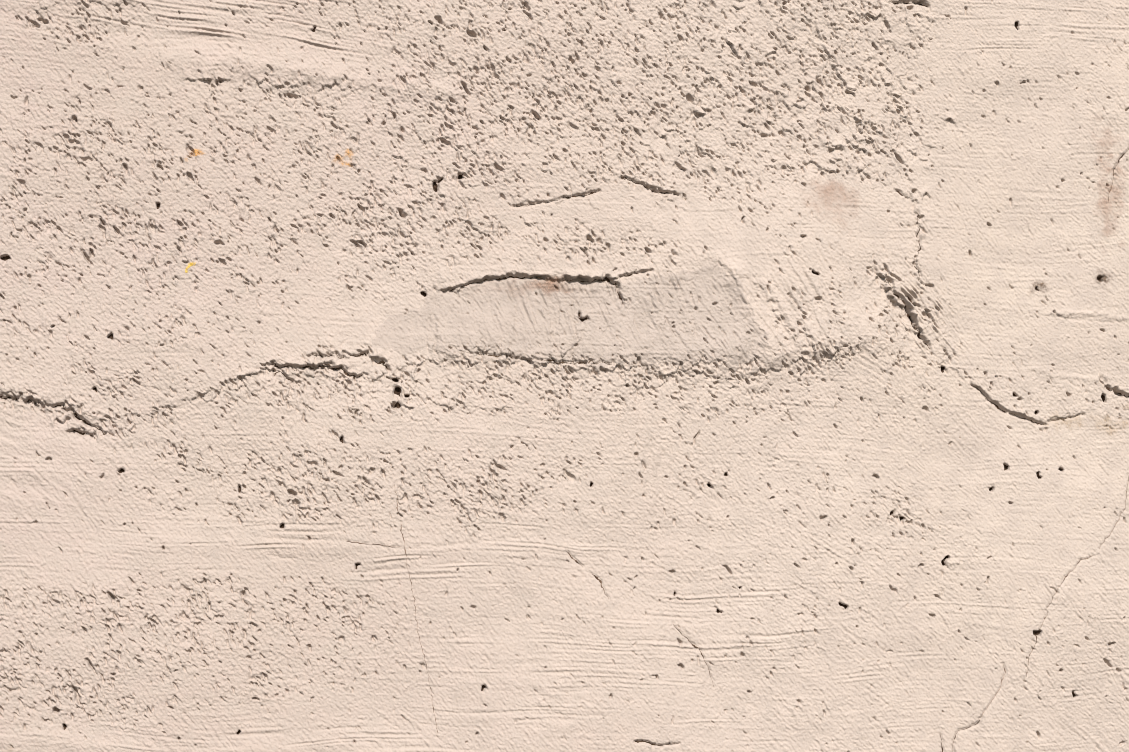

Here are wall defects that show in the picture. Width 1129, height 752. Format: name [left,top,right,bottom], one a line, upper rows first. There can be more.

crack [443,269,646,304]
crack [889,186,932,349]
crack [271,352,388,384]
crack [0,390,105,435]
crack [971,384,1078,425]
crack [1106,386,1129,398]
crack [940,477,1129,752]